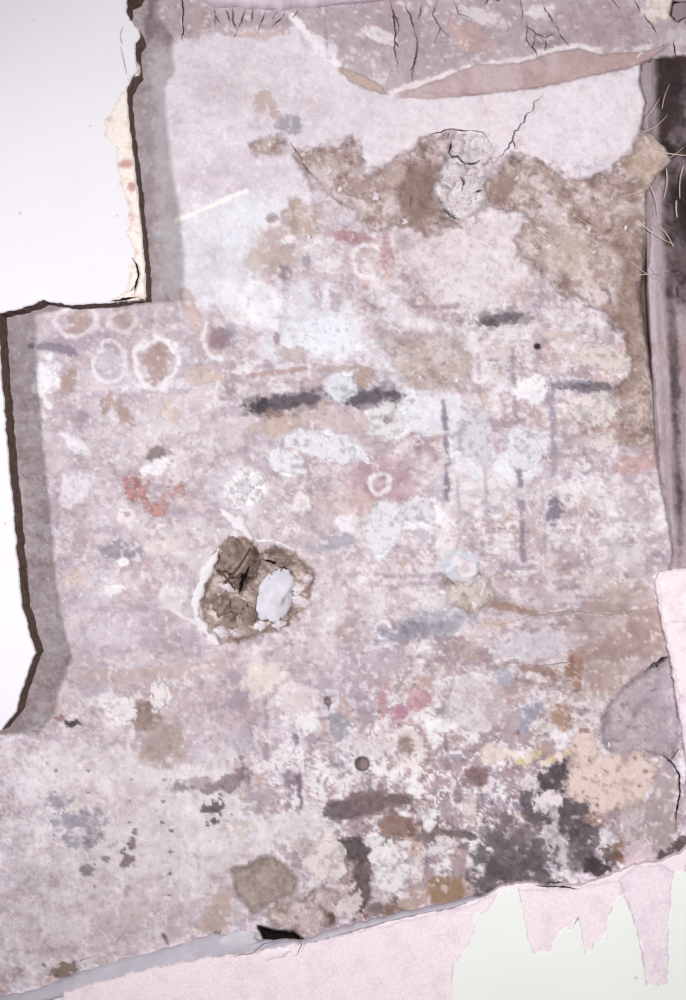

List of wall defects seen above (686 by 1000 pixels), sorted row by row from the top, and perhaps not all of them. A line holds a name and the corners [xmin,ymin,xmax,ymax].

crack [390,0,568,80]
crack [427,96,542,163]
damp [656,57,686,303]
flaking render [249,84,686,449]
damp [670,338,680,433]
flaking render [191,428,371,647]
peeling [0,836,496,1000]
damp [340,837,397,921]
peeling [364,807,460,893]
damp [323,758,621,896]